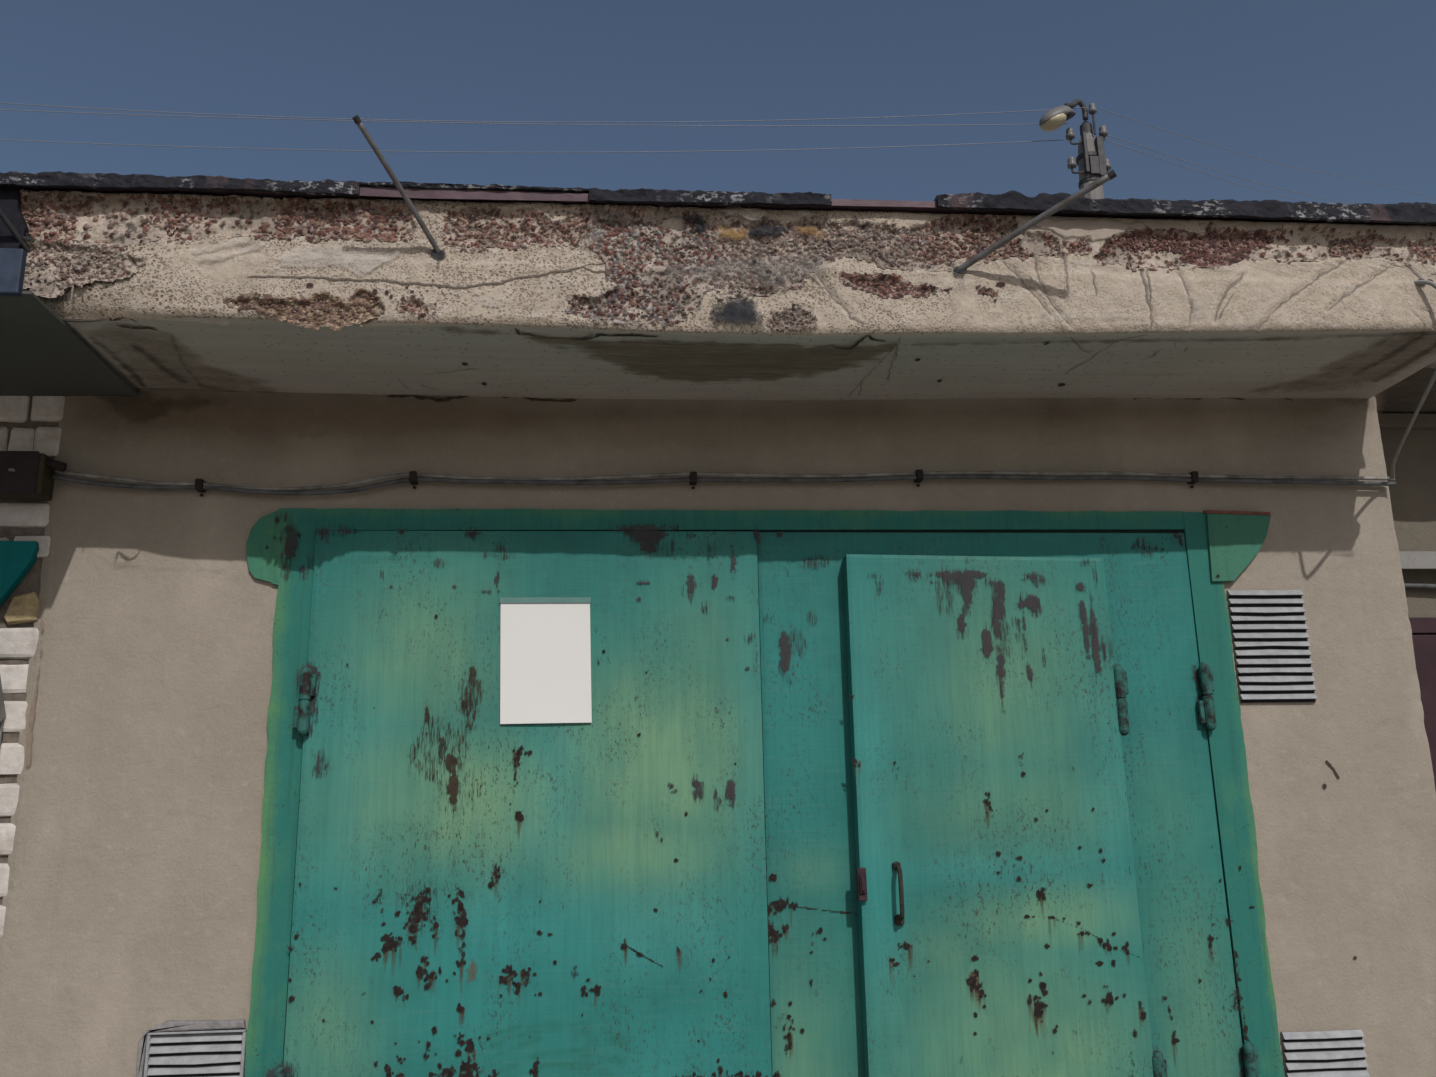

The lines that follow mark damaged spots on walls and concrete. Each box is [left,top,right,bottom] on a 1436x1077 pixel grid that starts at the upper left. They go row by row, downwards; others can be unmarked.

spalling [20,190,438,332]
crack [247,263,640,288]
water stain [530,337,896,382]
water stain [696,288,763,326]
spalling [441,204,1436,332]
crack [1002,251,1244,374]
crack [1258,260,1436,331]
rust [906,570,1046,702]
rust [408,666,481,813]
rust [371,877,468,1000]
rust [1024,887,1139,967]
rust [418,1026,499,1077]